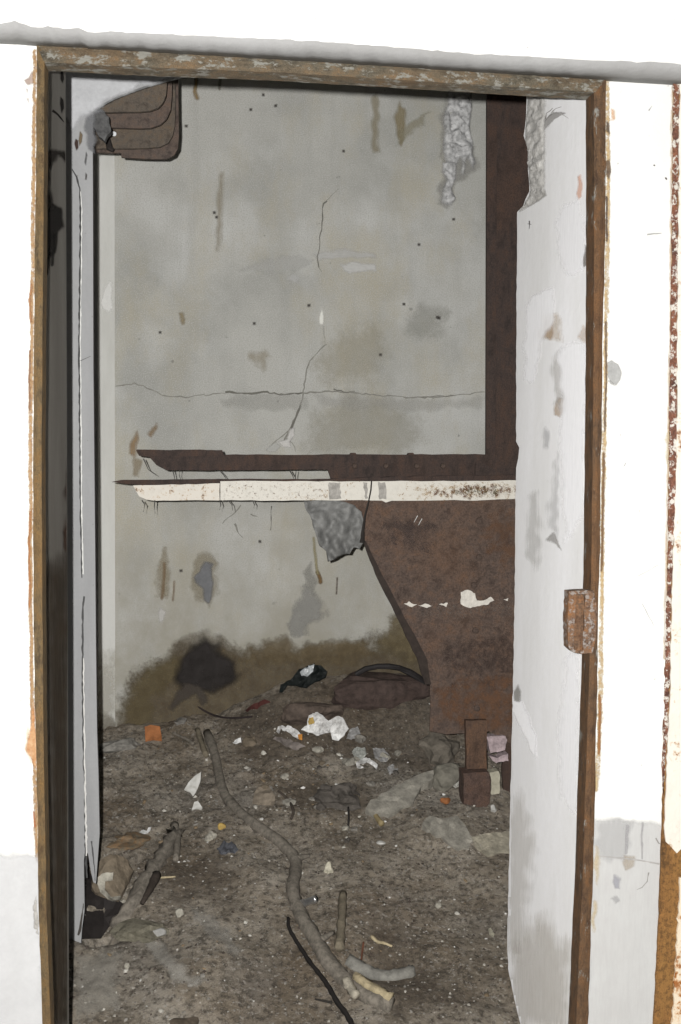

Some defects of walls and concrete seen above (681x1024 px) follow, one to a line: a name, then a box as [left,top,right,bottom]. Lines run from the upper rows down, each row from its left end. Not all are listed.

spalling [519,96,546,211]
crack [317,189,338,272]
crack [115,336,483,452]
rust [661,84,680,796]
leakage [97,569,422,731]
rust [671,877,681,1024]